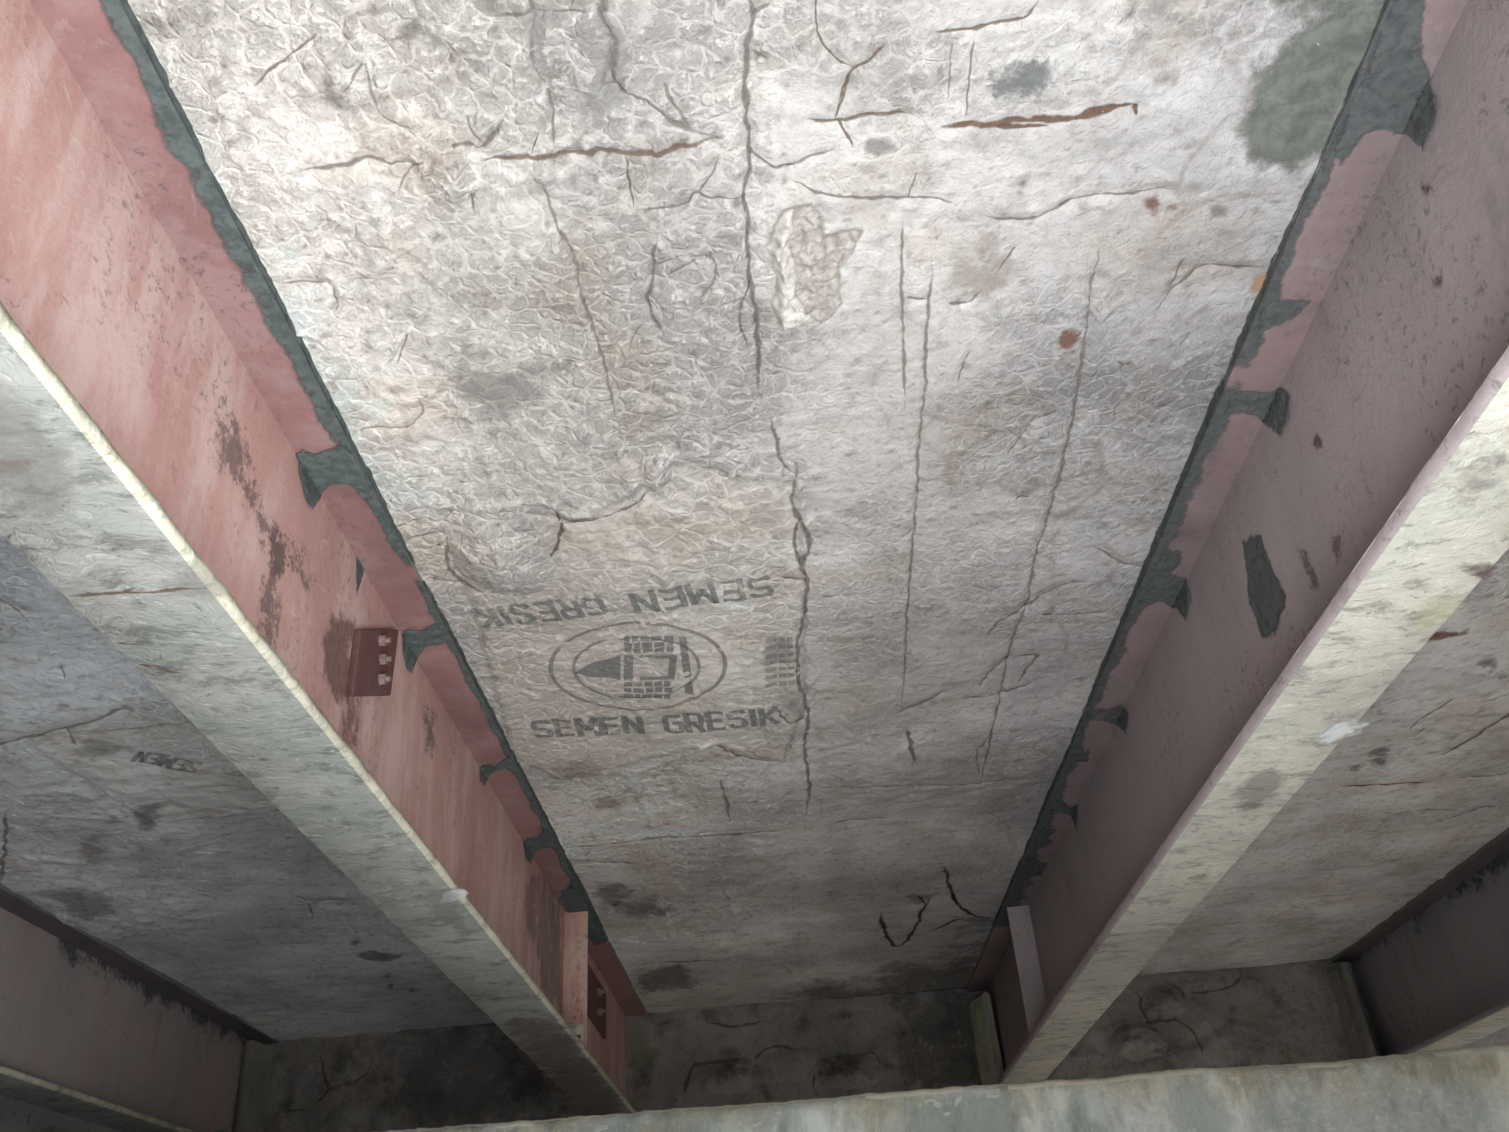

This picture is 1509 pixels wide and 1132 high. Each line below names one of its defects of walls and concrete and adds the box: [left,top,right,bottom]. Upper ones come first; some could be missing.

peeling [1335,0,1437,165]
crack [288,280,339,307]
spalling [766,206,863,330]
corrosion [216,398,311,645]
peeling [296,447,375,509]
crack [312,0,1160,864]
leakage [993,0,1397,927]
corrosion [324,616,360,745]
peeling [402,623,449,673]
peeling [1242,535,1286,638]
crack [1347,700,1509,822]
crack [879,868,979,947]